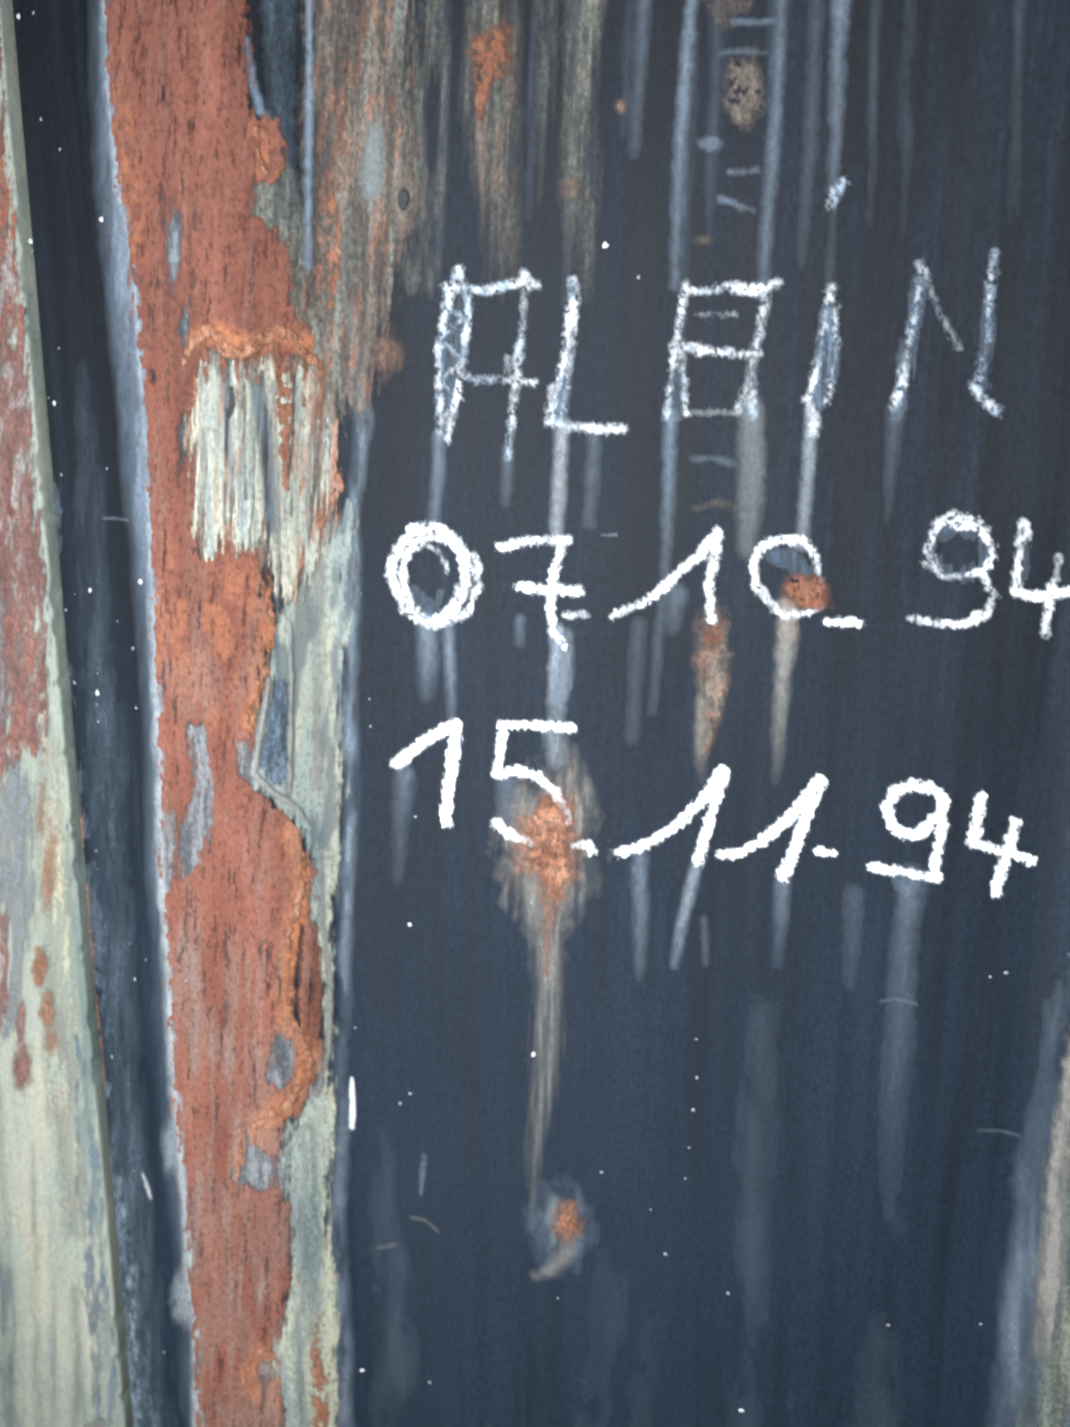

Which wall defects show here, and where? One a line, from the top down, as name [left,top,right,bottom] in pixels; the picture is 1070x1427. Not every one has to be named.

peeling [164,209,180,286]
corrosion [0,91,95,1236]
corrosion [104,0,420,1427]
corrosion [776,575,826,706]
peeling [158,723,217,902]
peeling [183,308,358,1427]
corrosion [512,770,582,1044]
peeling [176,1280,191,1319]
corrosion [547,1203,577,1272]